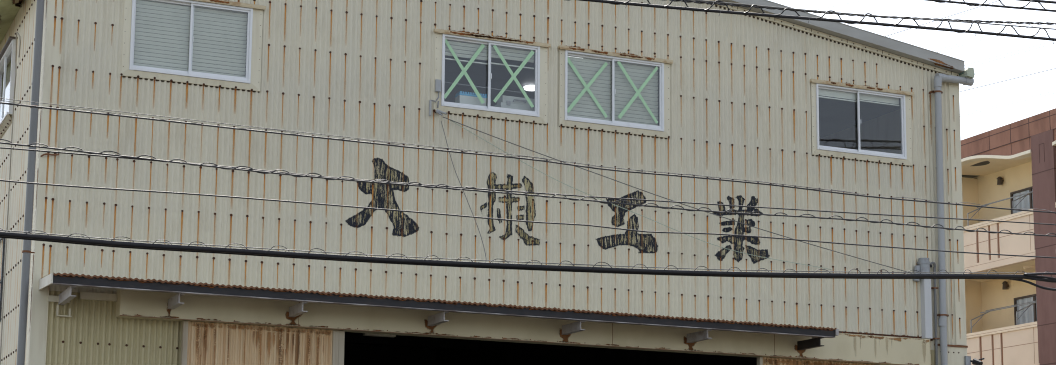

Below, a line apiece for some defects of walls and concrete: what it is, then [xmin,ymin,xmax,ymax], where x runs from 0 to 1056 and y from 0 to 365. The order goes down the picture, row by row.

corrosion [46,0,64,46]
corrosion [449,0,656,60]
corrosion [667,35,932,144]
corrosion [36,67,60,229]
corrosion [30,246,51,318]
corrosion [245,262,310,293]
corrosion [320,268,432,302]
corrosion [488,202,629,316]
corrosion [192,312,330,365]